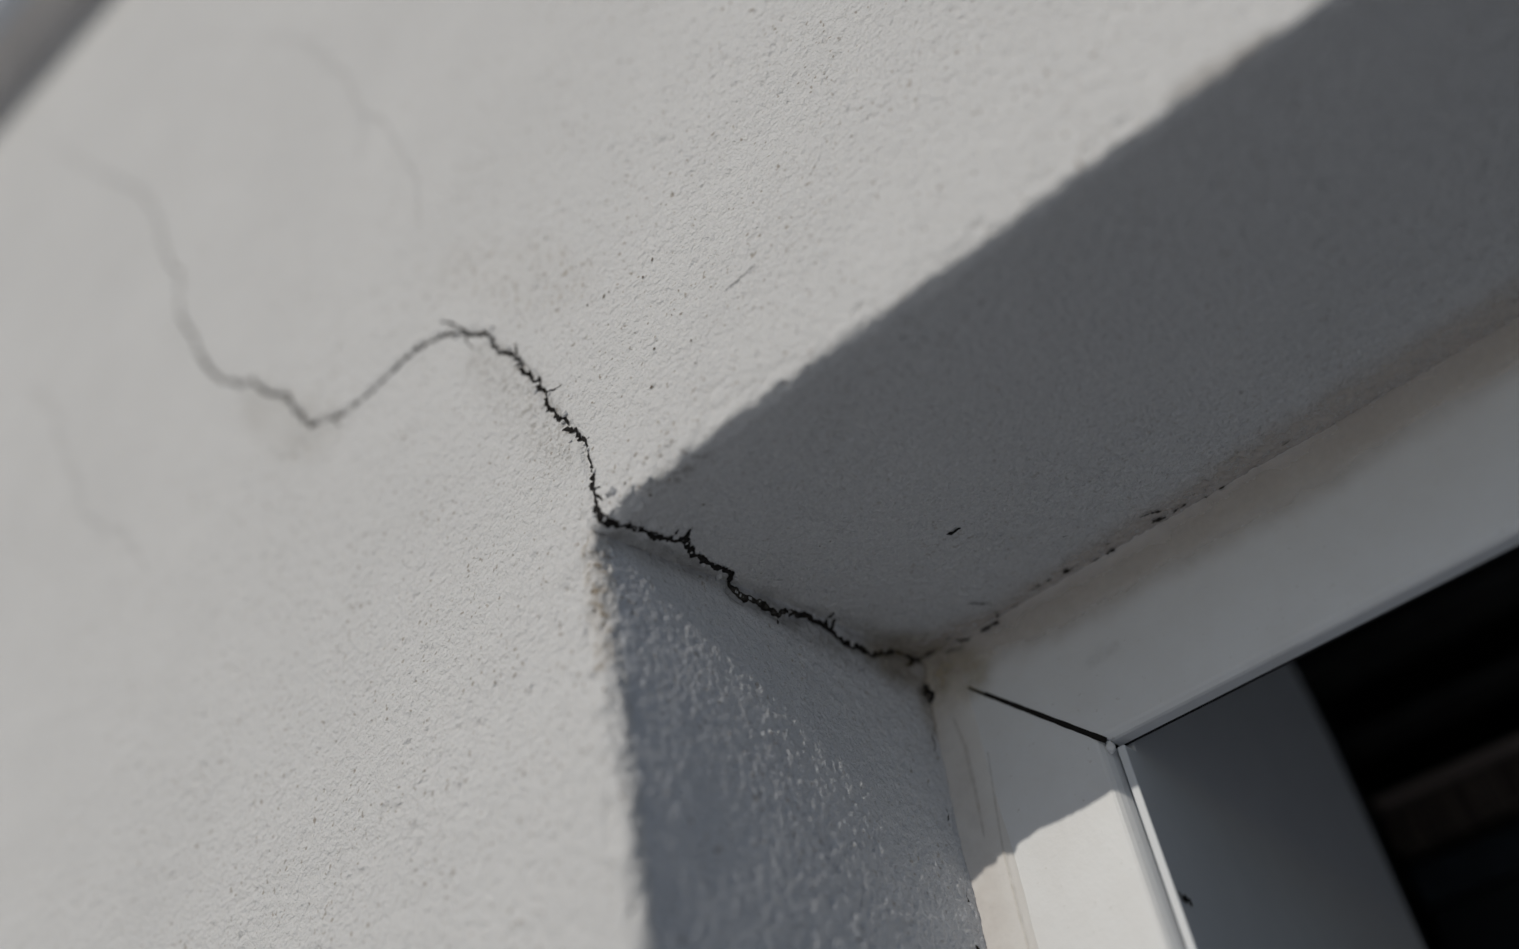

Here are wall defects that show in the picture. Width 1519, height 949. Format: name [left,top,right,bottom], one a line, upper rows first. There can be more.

crack [56,146,1115,667]
crack [1140,486,1224,524]
crack [983,692,1107,744]